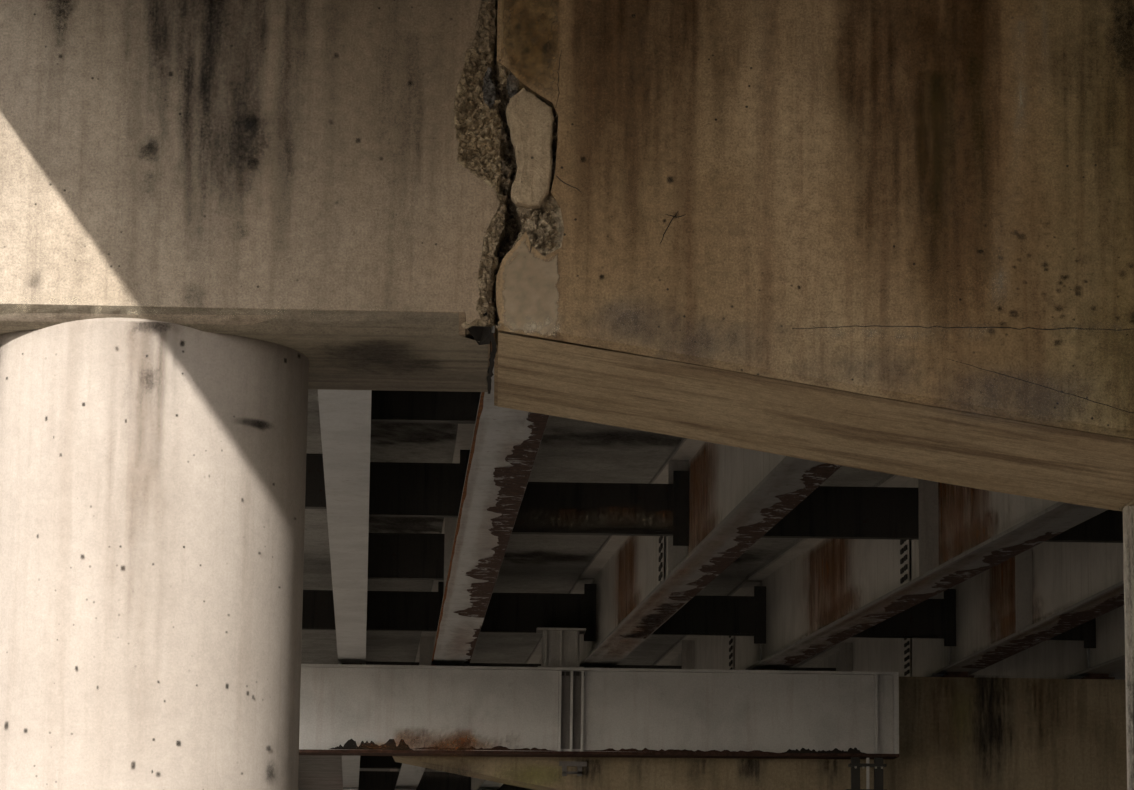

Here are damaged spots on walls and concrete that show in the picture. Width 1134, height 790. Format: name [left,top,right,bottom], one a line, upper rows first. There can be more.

leakage [184,0,215,123]
spalling [454,49,564,257]
crack [462,0,581,394]
leakage [870,0,898,203]
spalling [467,312,491,345]
crack [792,324,1131,332]
crack [946,358,1133,413]
corrosion [330,730,553,751]